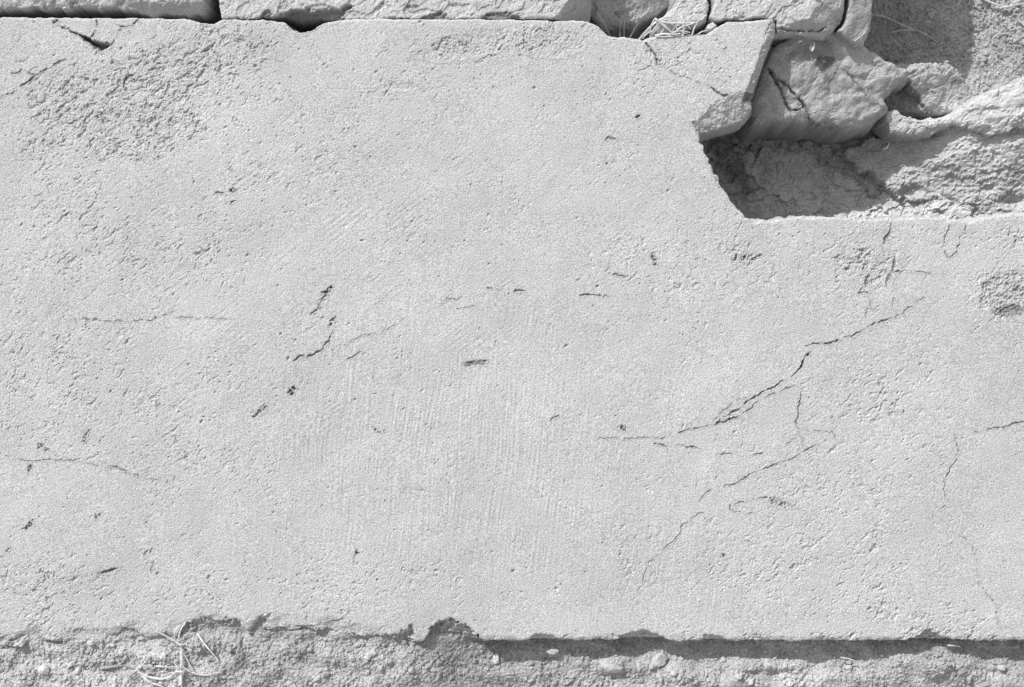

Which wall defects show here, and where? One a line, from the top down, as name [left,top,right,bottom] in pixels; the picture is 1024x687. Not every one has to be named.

peeling [689,19,775,138]
crack [599,223,967,593]
peeling [7,632,28,647]
peeling [96,626,137,642]
peeling [150,609,276,640]
peeling [347,616,485,641]
peeling [526,629,578,640]
peeling [611,627,674,640]
peeling [904,623,954,641]